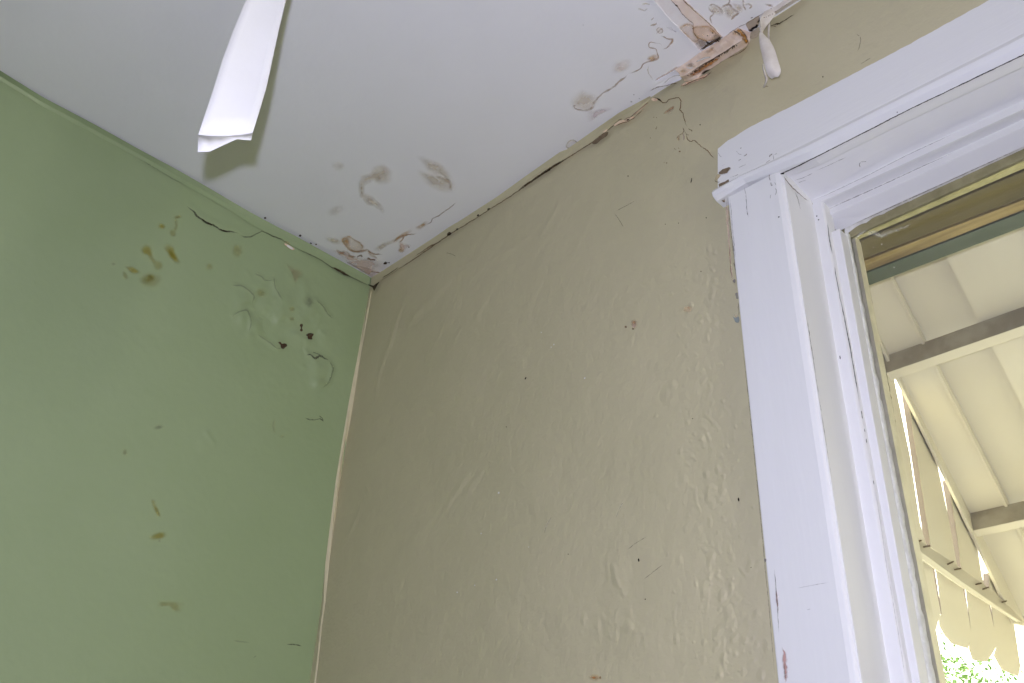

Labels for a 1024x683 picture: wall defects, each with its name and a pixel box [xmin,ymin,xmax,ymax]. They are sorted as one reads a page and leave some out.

peeling [759,9,781,88]
crack [657,54,1024,218]
crack [190,209,280,239]